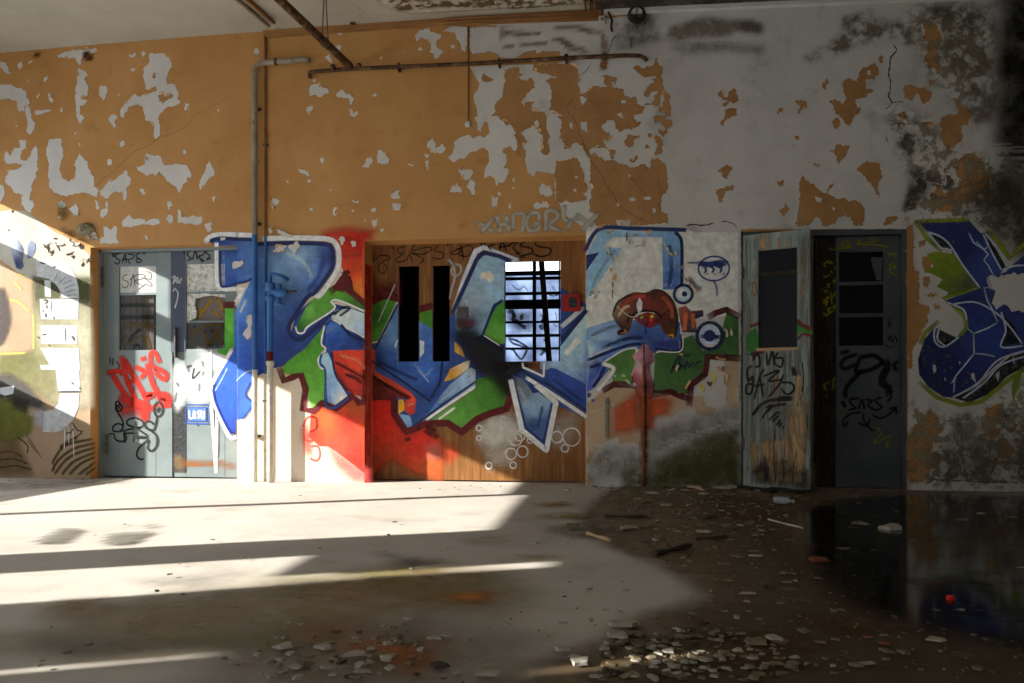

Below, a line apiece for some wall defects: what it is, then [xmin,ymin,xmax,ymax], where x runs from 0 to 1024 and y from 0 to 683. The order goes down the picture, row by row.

peeling [0,47,225,303]
peeling [362,150,390,169]
crack [567,99,697,299]
peeling [379,0,1024,492]
crack [886,45,903,142]
leakage [831,0,1024,253]
peeling [243,315,252,339]
crack [675,353,691,393]
crack [715,327,733,380]
leakage [912,384,1024,481]